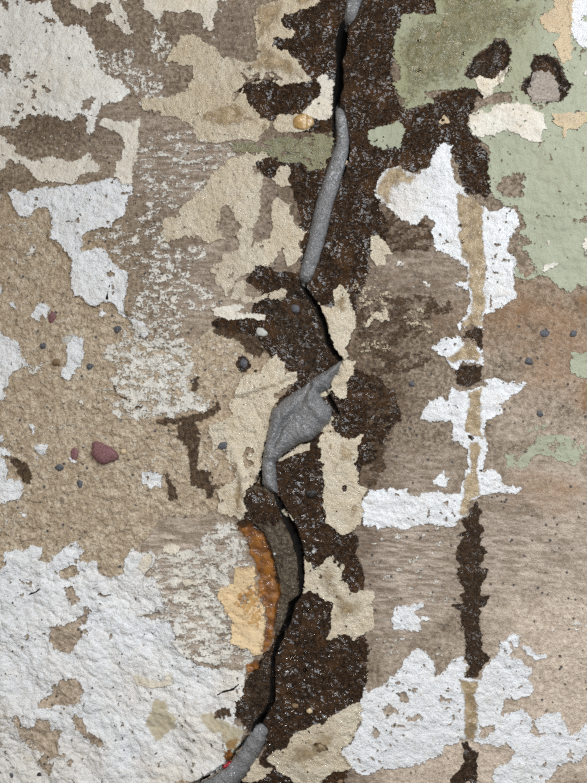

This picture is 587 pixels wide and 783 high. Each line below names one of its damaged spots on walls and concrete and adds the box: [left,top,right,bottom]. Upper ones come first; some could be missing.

crack [332,19,350,177]
peeling [368,0,587,370]
spalling [0,0,393,783]
crack [300,281,344,362]
crack [327,394,340,415]
peeling [570,352,587,378]
crack [199,442,305,782]
rust [246,660,259,673]
rust [230,524,280,651]
peeling [242,555,587,783]